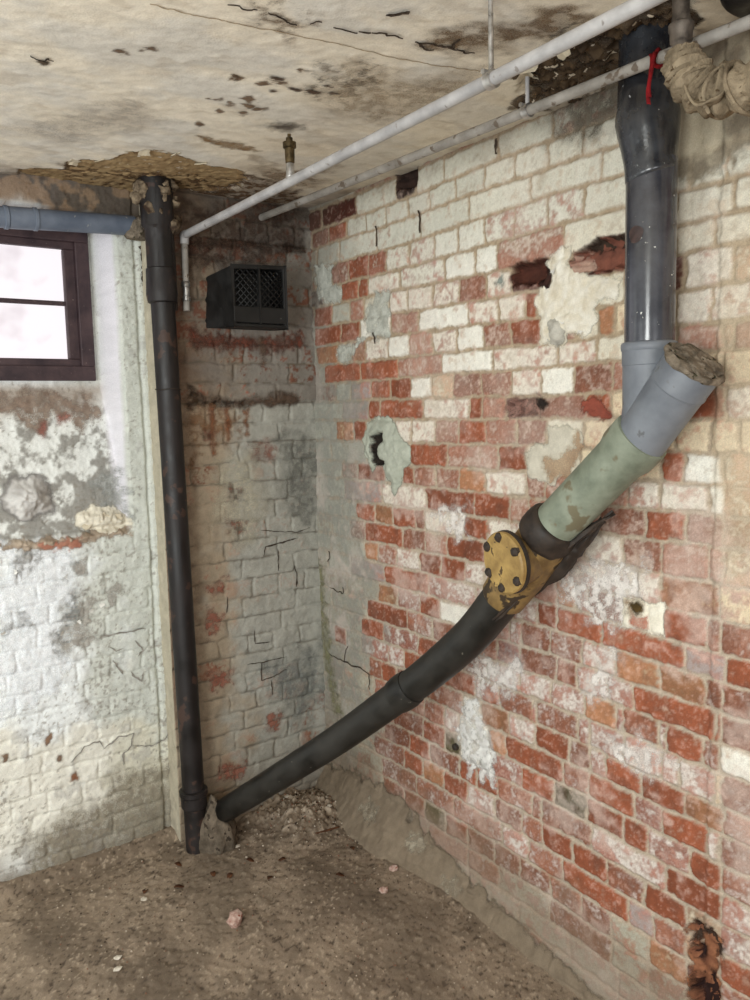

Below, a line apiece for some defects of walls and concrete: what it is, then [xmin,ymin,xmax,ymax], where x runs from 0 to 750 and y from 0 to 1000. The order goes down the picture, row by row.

crack [150,4,480,72]
flaking render [508,0,672,111]
water stain [205,96,266,114]
water stain [255,65,462,119]
flaking render [18,150,249,196]
spalling [510,258,556,289]
spalling [569,233,625,275]
crack [261,527,310,586]
crack [248,631,286,695]
water stain [468,657,523,699]
crack [73,733,168,765]
water stain [467,759,496,789]